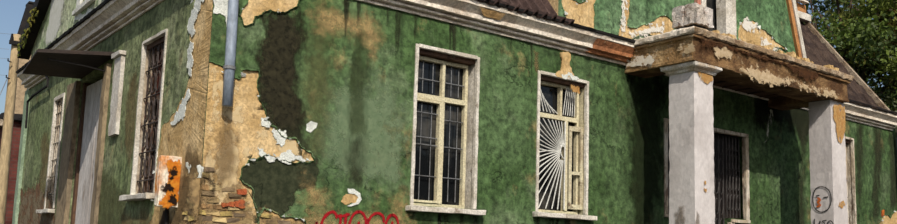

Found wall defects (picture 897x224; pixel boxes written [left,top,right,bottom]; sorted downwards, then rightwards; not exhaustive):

peeling [321,11,376,44]
flaking render [555,52,579,81]
flaking render [148,0,329,224]
water stain [218,6,320,224]
spalling [341,189,362,206]
flaking render [878,209,897,224]